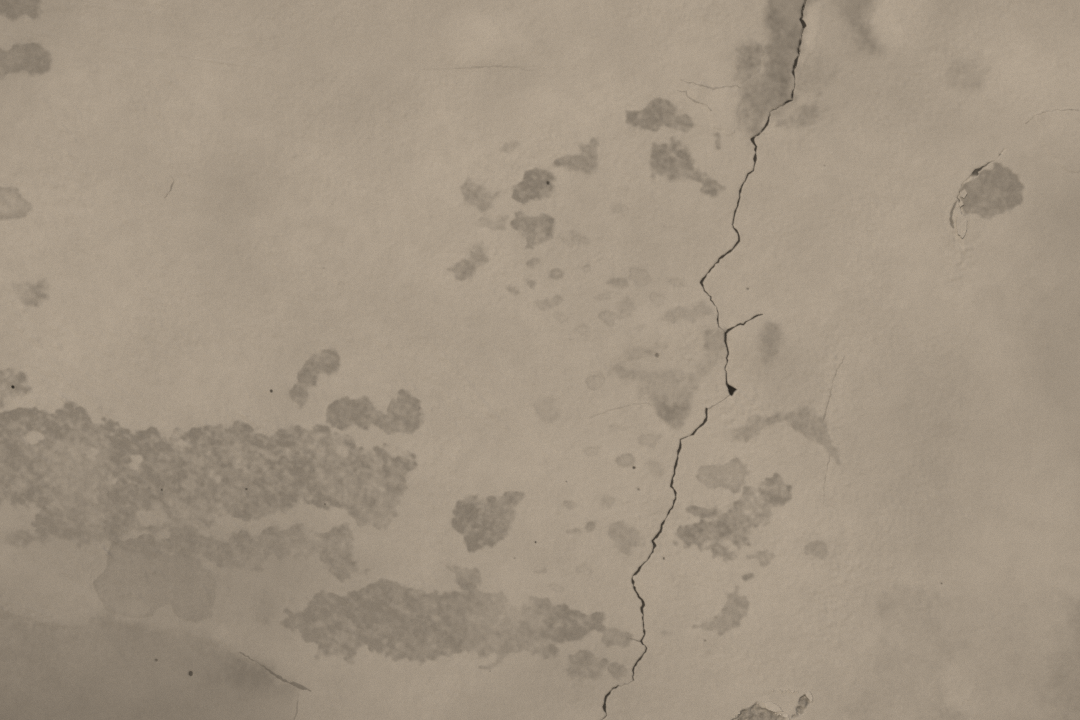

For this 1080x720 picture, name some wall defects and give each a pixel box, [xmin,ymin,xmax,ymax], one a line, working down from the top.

leakage [721,0,889,147]
peeling [949,153,1027,238]
crack [600,0,807,720]
flaking render [732,688,813,720]